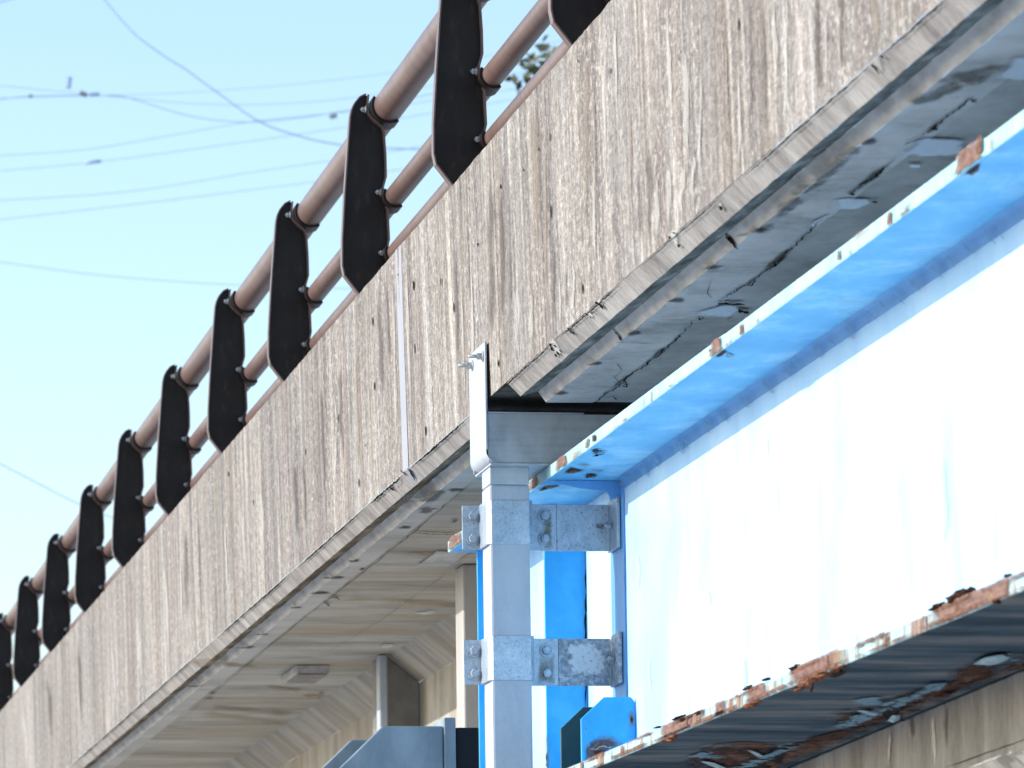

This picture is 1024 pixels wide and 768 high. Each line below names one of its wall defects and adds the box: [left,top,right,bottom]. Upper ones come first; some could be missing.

crack [645,1,944,263]
crack [922,97,977,136]
corrosion [954,135,991,176]
crack [707,216,826,302]
crack [592,322,692,407]
corrosion [709,318,758,358]
corrosion [529,477,559,491]
corrosion [555,434,597,478]
corrosion [918,571,1024,631]
peeling [974,653,1024,670]
corrosion [569,625,906,768]
corrosion [684,660,1022,768]